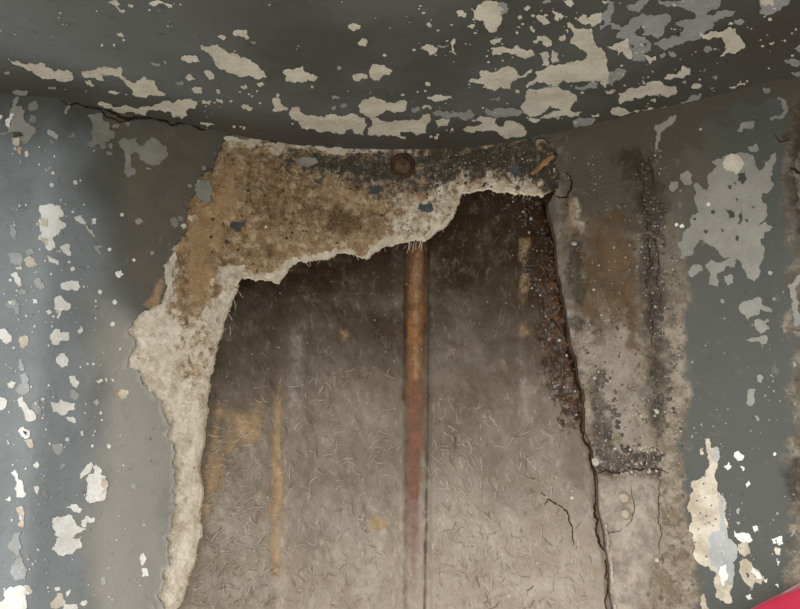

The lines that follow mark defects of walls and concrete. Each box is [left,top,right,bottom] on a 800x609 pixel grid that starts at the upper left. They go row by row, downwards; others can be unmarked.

peeling [0,58,223,177]
crack [60,101,205,131]
peeling [10,203,111,368]
spalling [127,0,745,609]
damp [570,200,584,233]
peeling [669,144,776,287]
peeling [7,359,103,448]
corrosion [407,245,425,542]
crack [539,162,666,609]
peeling [0,470,48,609]
peeling [52,504,95,556]
peeling [687,438,779,609]